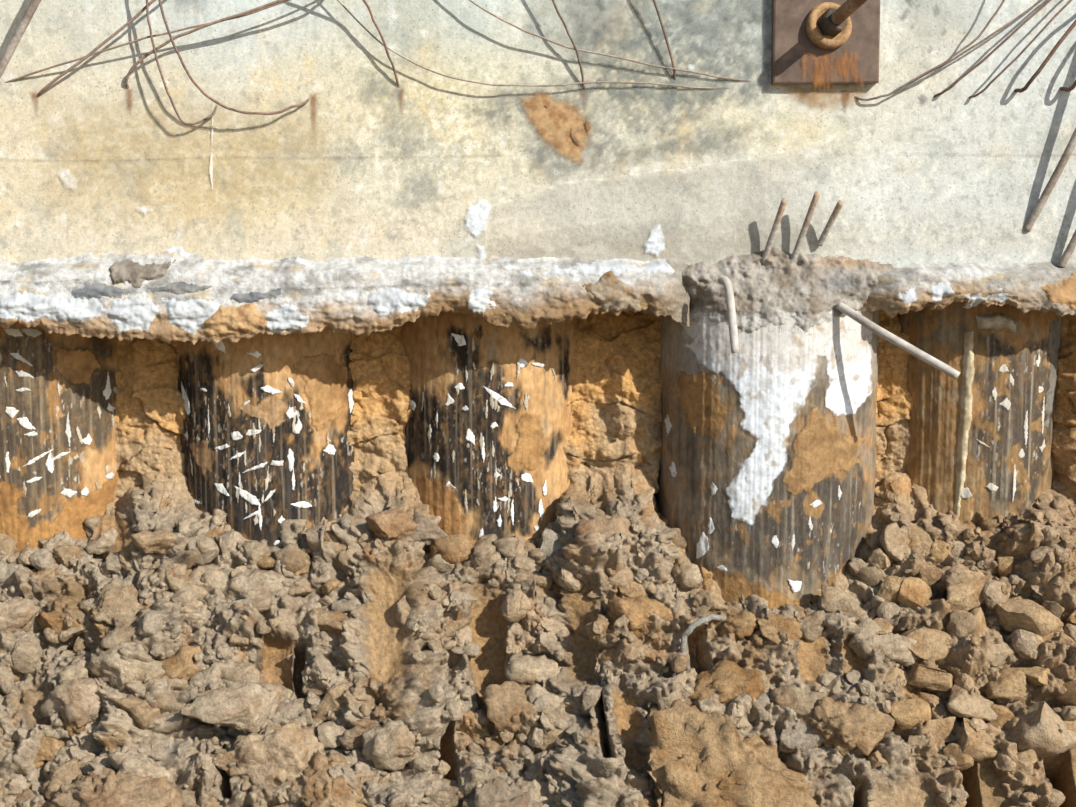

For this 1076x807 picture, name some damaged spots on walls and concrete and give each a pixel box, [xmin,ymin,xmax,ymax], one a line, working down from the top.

corrosion [798,53,857,104]
spalling [524,93,591,161]
spalling [109,258,176,288]
spalling [582,271,642,313]
spalling [1040,273,1076,311]
spalling [202,303,267,353]
water stain [680,310,873,525]